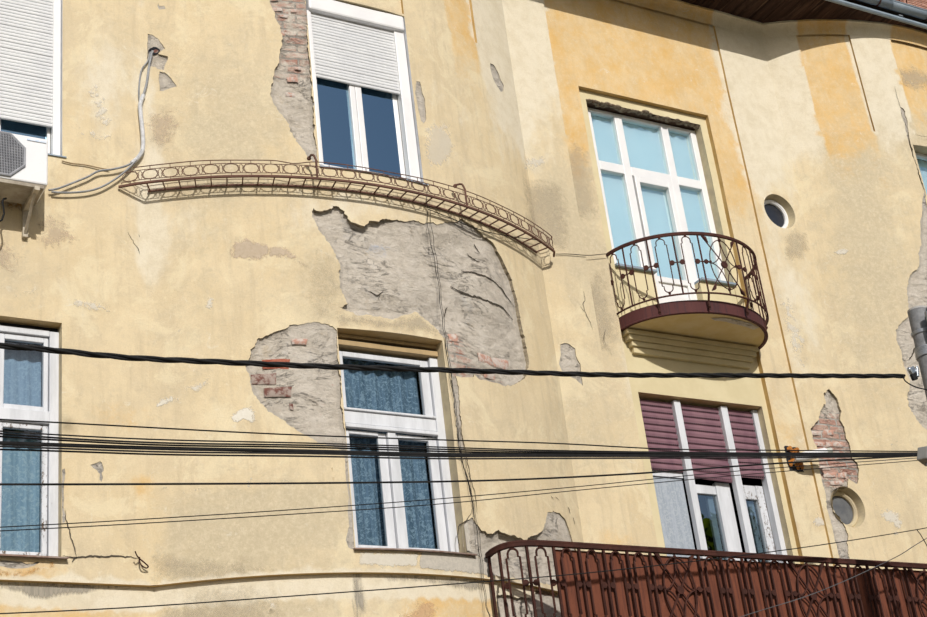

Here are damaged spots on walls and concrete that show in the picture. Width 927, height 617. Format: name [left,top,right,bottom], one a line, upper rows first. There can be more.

spalling [270,0,318,162]
spalling [232,322,576,617]
spalling [312,206,529,449]
crack [444,244,514,549]
spalling [559,343,583,385]
spalling [811,389,859,559]
spalling [896,108,927,429]